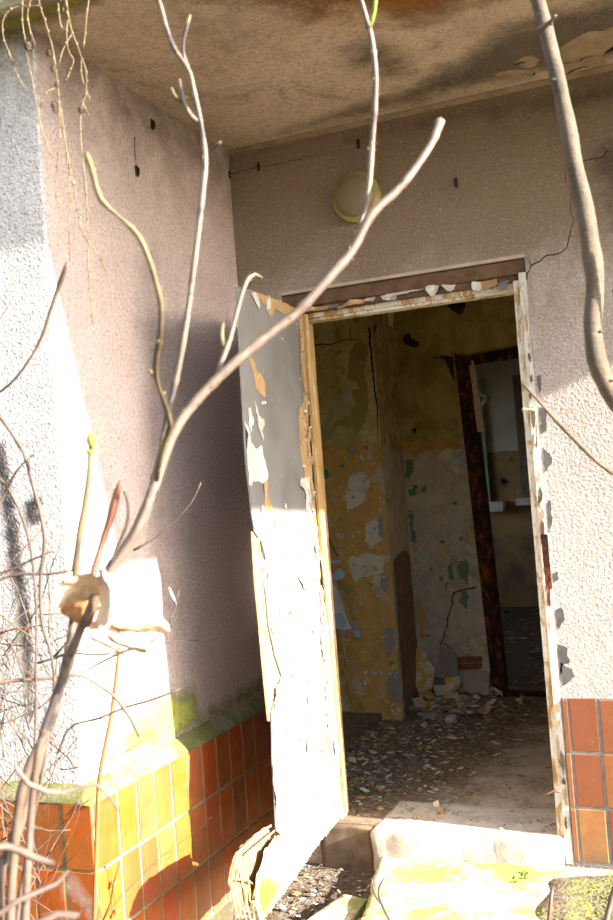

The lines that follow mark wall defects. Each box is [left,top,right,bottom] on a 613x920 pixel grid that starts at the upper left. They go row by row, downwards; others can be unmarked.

flaking render [560,27,613,74]
crack [526,145,613,280]
peeling [251,292,274,319]
peeling [307,284,456,311]
flaking render [448,302,466,314]
peeling [471,278,509,291]
crack [314,315,379,444]
peeling [244,399,272,486]
peeling [273,317,431,818]
peeling [429,560,469,612]
crack [440,586,476,647]
flaking render [457,656,482,670]